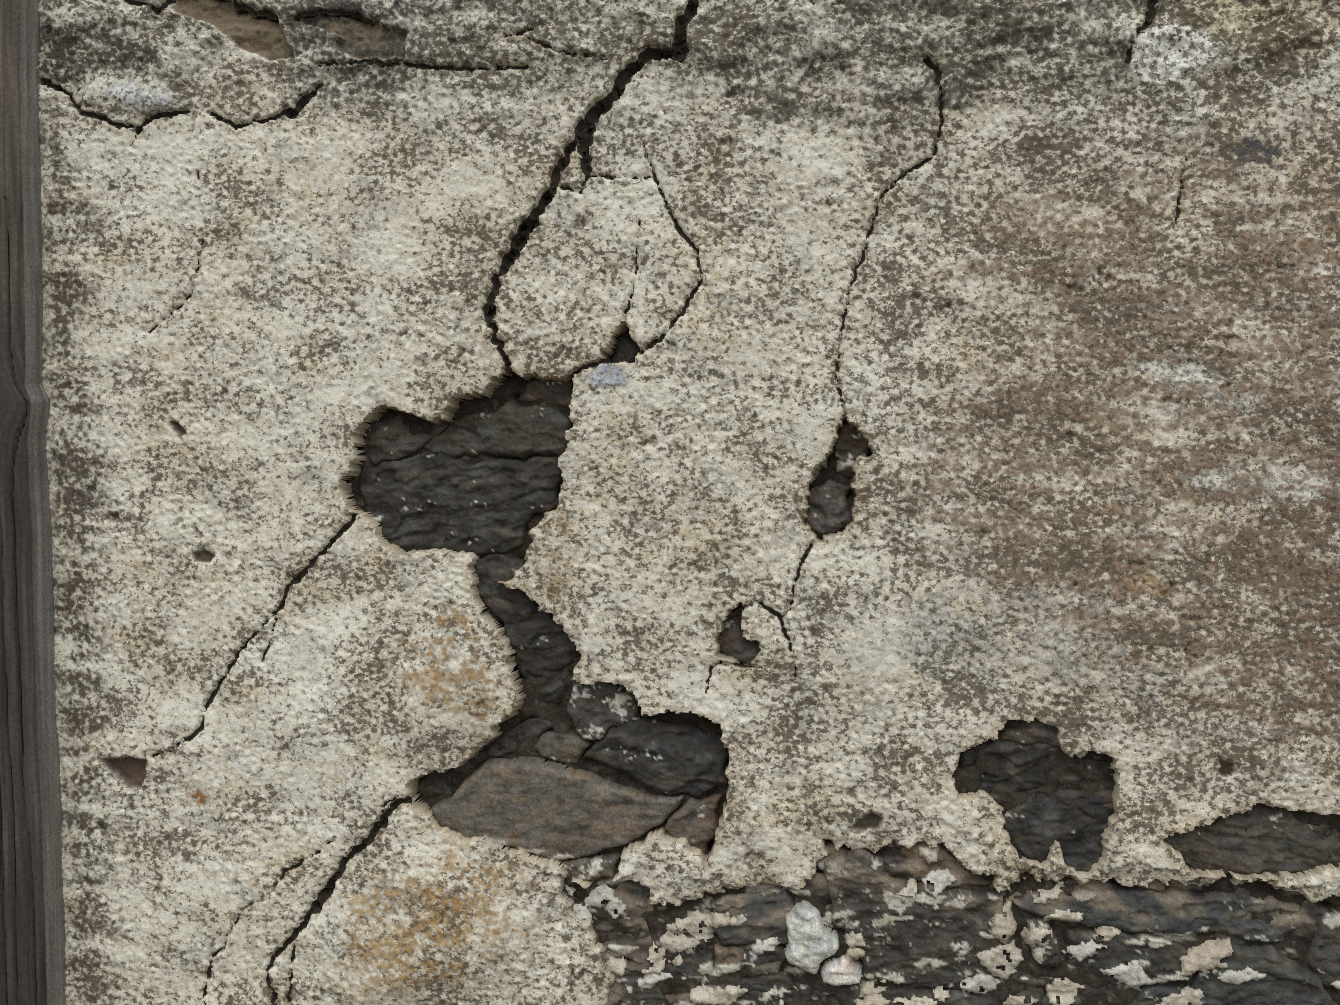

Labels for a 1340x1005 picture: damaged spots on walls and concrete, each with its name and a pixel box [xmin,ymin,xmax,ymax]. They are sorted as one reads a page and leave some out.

flaking render [171,0,406,61]
crack [835,58,944,413]
flaking render [799,414,875,543]
crack [152,513,358,758]
flaking render [337,363,748,1005]
crack [705,660,754,693]
flaking render [714,602,761,671]
crack [727,543,813,677]
flaking render [103,756,147,791]
crack [202,796,412,1005]
flaking render [750,936,781,955]
flaking render [759,717,1340,1005]